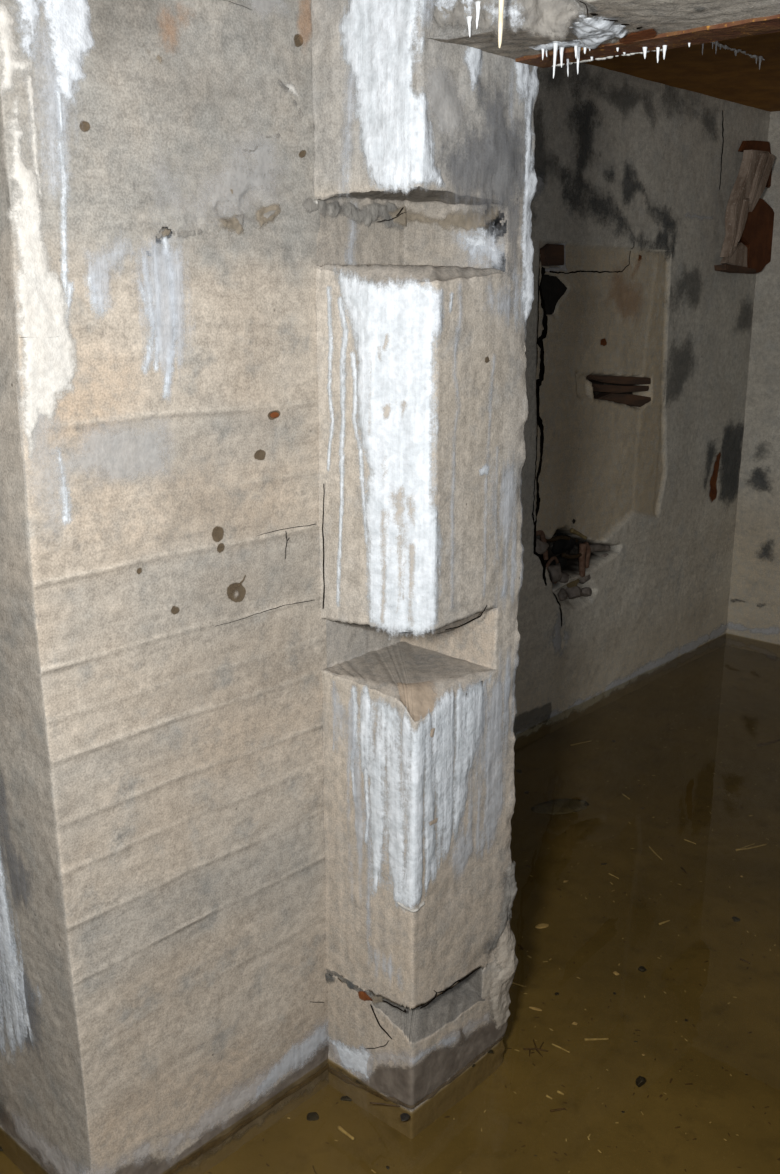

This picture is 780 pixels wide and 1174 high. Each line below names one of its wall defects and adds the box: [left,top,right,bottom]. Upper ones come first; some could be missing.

damp [529,15,663,67]
damp [0,0,94,458]
spalling [303,198,498,262]
damp [339,0,567,322]
damp [563,102,712,256]
damp [141,236,183,398]
damp [327,271,461,636]
crack [532,246,634,627]
damp [704,424,770,502]
crack [445,605,487,630]
damp [336,623,779,913]
damp [0,1014,508,1174]